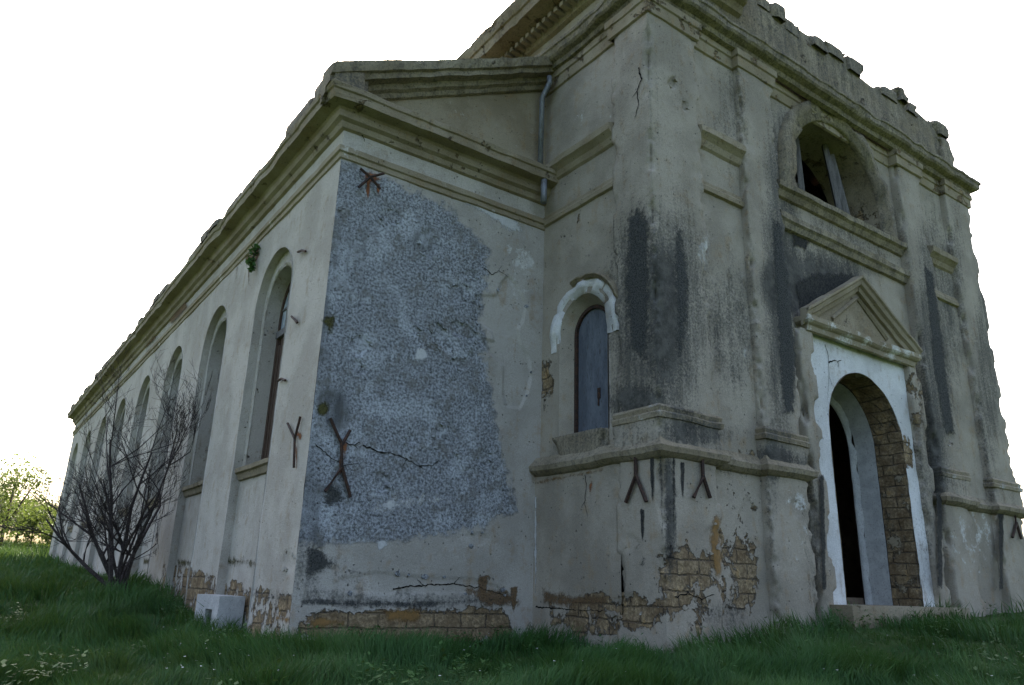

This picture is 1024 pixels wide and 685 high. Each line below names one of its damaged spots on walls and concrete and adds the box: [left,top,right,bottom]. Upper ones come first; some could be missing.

damp [623,207,652,359]
damp [673,231,689,357]
crack [315,442,439,473]
crack [393,577,508,597]